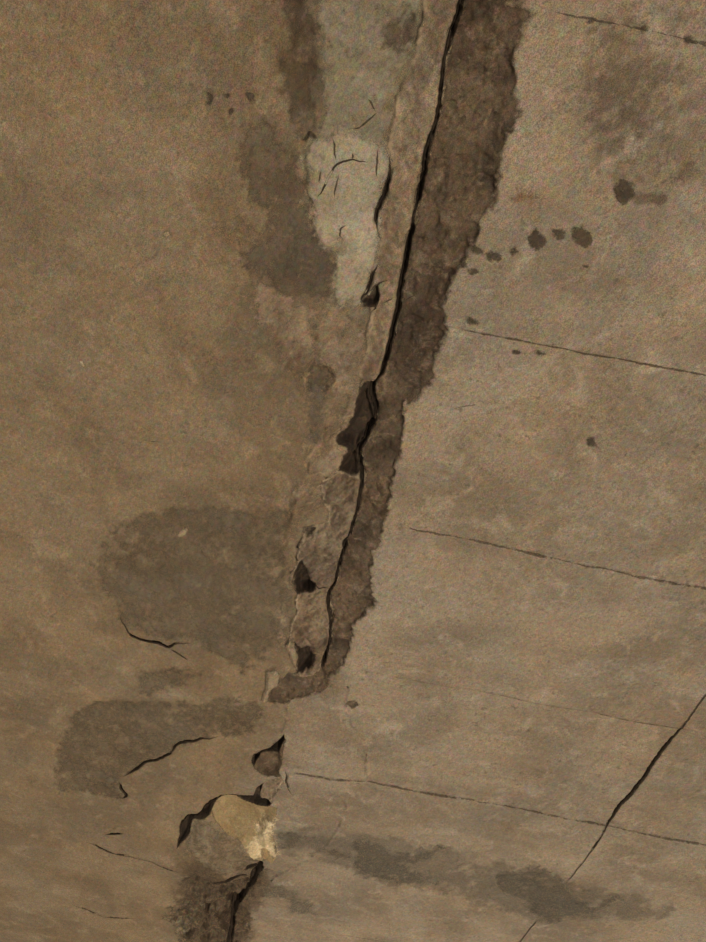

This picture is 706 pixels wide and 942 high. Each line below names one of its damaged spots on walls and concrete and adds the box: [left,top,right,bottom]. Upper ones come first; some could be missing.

leakage [460,245,518,275]
leakage [528,227,593,251]
crack [315,0,464,671]
spalling [54,0,531,804]
crack [121,620,191,660]
crack [120,737,216,799]
crack [570,695,706,879]
leakage [353,839,442,884]
spalling [163,864,267,942]
leakage [496,866,622,923]